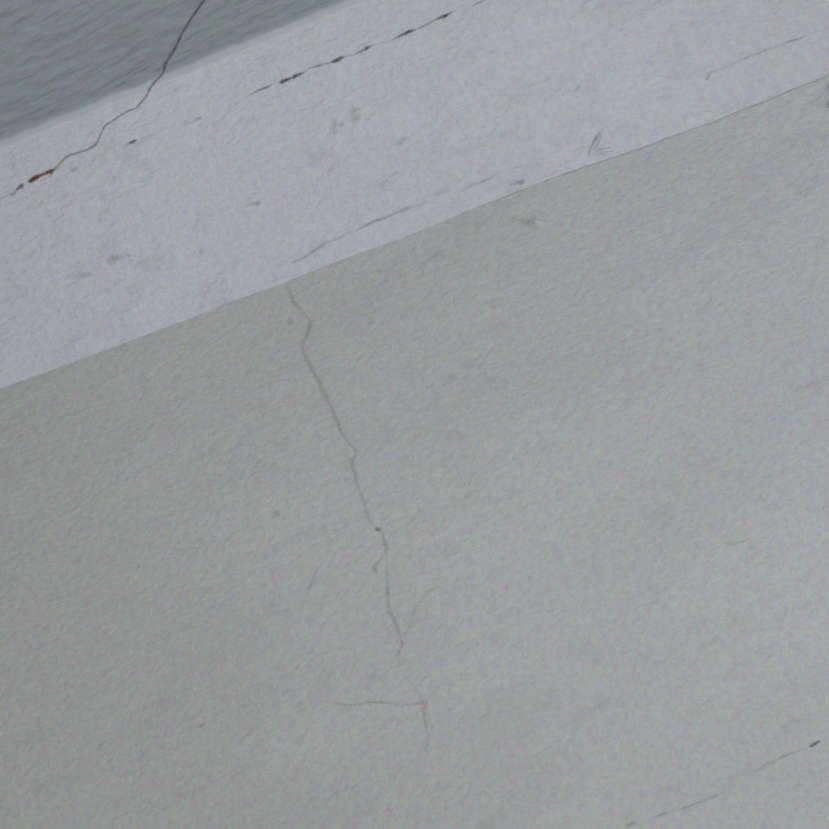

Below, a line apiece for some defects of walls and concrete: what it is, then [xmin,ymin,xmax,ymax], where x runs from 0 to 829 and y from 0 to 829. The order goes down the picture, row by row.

crack [17,169,54,189]